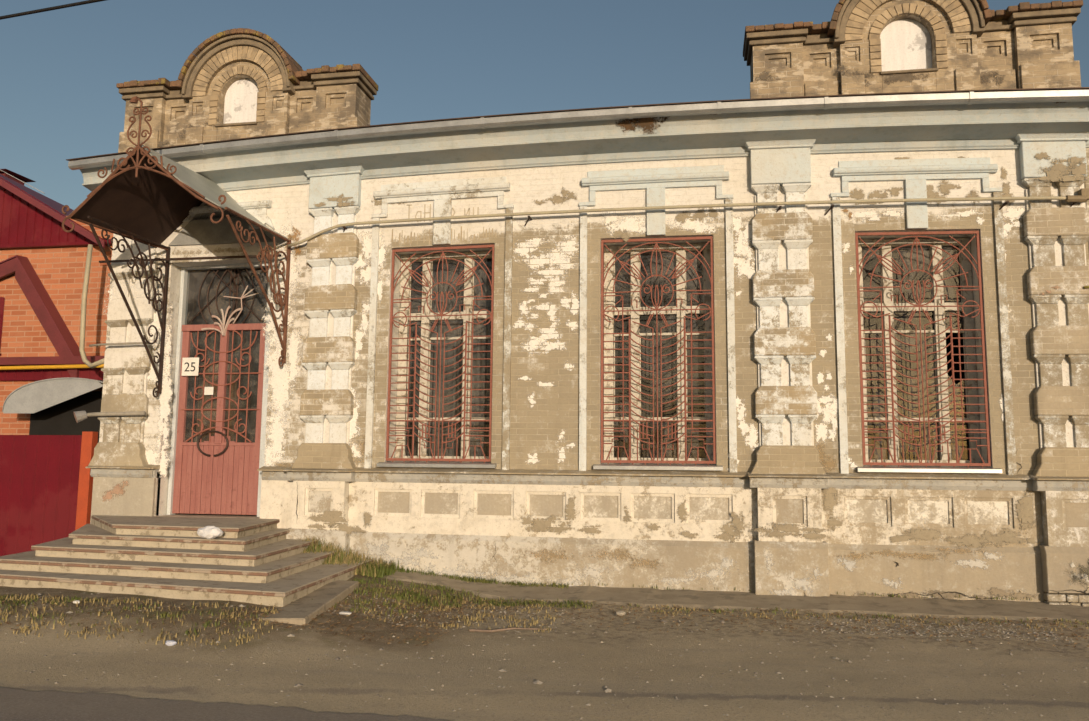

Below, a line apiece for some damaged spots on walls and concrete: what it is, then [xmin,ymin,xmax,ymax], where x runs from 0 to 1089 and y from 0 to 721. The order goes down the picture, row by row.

peeling [1035,152,1087,182]
peeling [315,193,355,207]
peeling [535,188,577,205]
peeling [845,187,903,222]
peeling [926,180,984,225]
peeling [513,235,580,354]
peeling [518,376,554,407]
peeling [557,431,575,463]
peeling [308,509,372,534]
peeling [677,502,698,539]
peeling [890,490,1036,548]